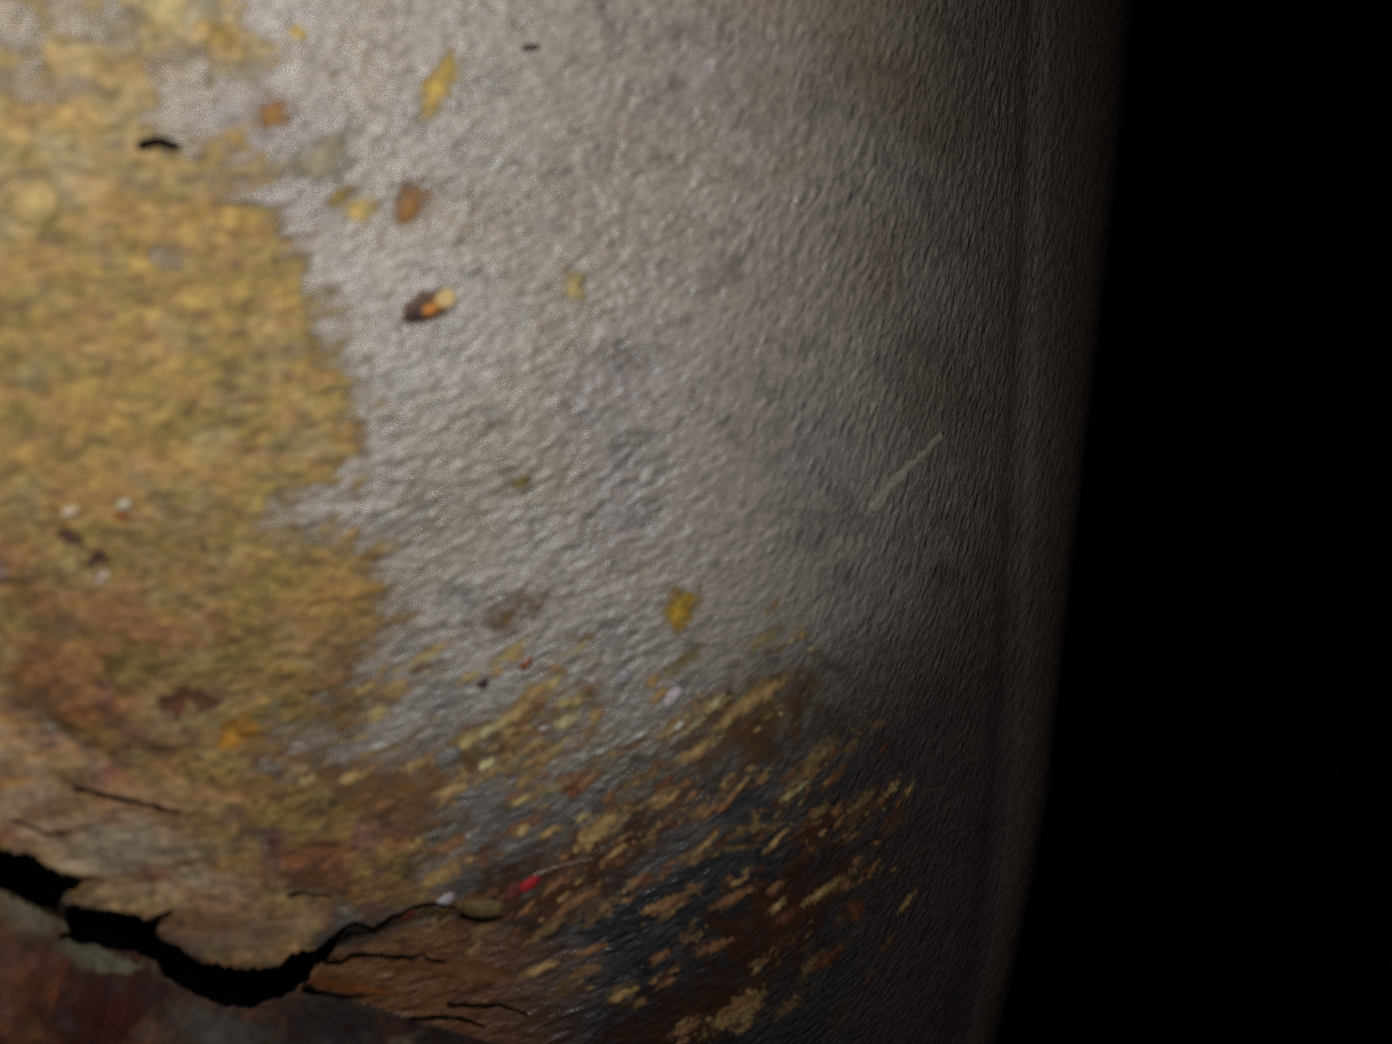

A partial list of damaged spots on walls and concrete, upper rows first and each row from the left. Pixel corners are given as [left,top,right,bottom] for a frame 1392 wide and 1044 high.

crack [72,785,180,814]
crack [0,818,509,1009]
crack [408,1001,528,1027]